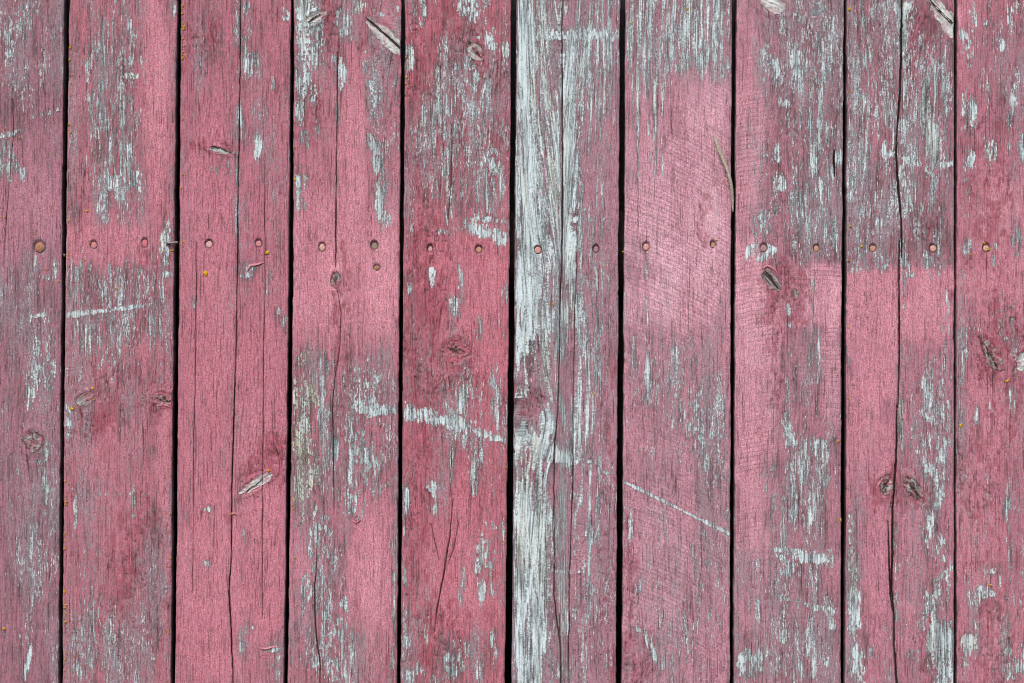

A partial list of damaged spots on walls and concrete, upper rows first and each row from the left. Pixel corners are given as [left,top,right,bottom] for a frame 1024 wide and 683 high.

peeling [69,0,147,224]
peeling [411,0,428,28]
peeling [745,0,977,320]
crack [211,0,263,668]
peeling [292,346,395,683]
crack [431,503,459,631]
peeling [420,0,731,683]
crack [883,0,921,683]
peeling [898,269,1015,683]